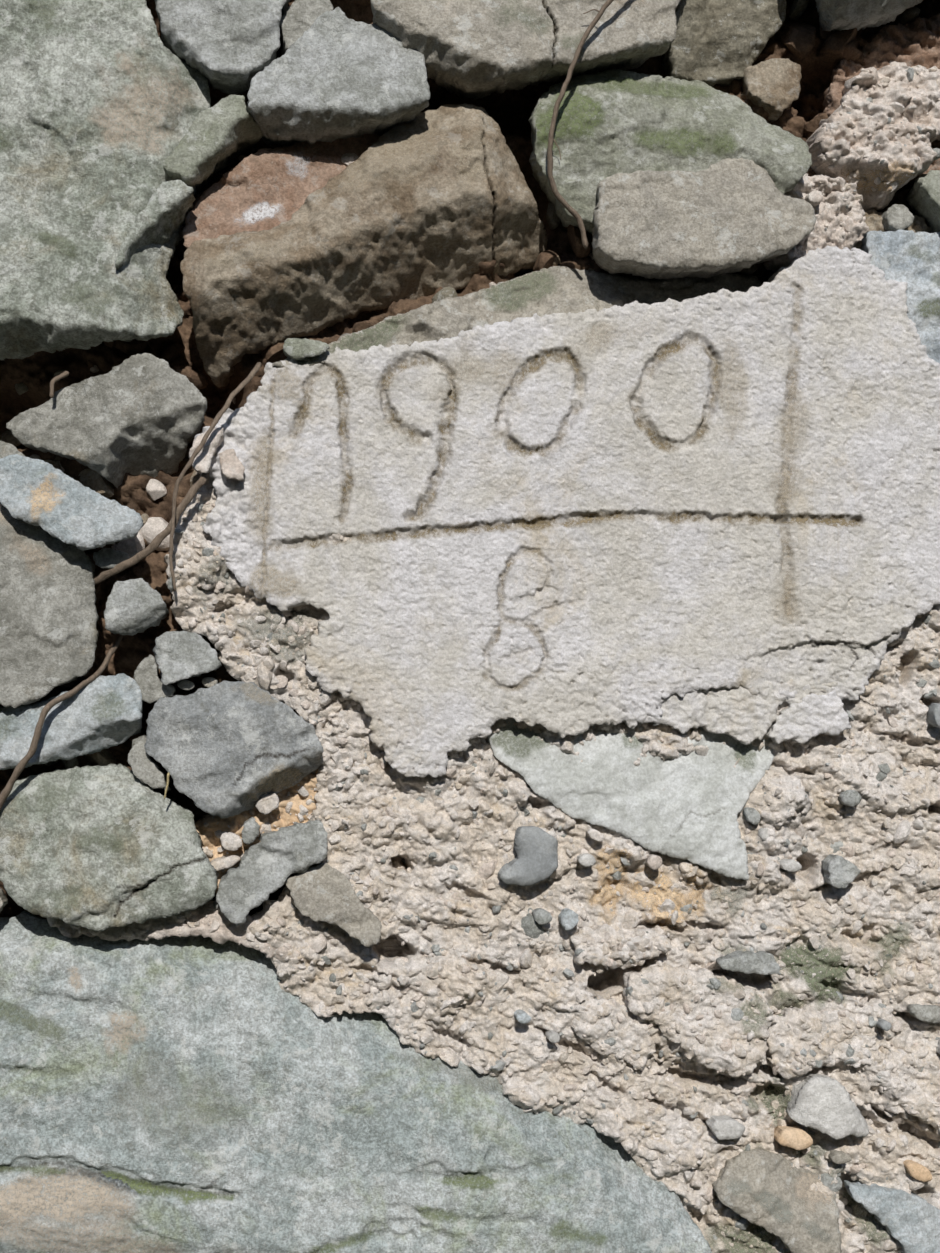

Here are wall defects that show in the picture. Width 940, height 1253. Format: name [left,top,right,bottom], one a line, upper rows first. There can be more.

crack [542,0,556,68]
crack [115,859,204,916]
spalling [164,476,940,1253]